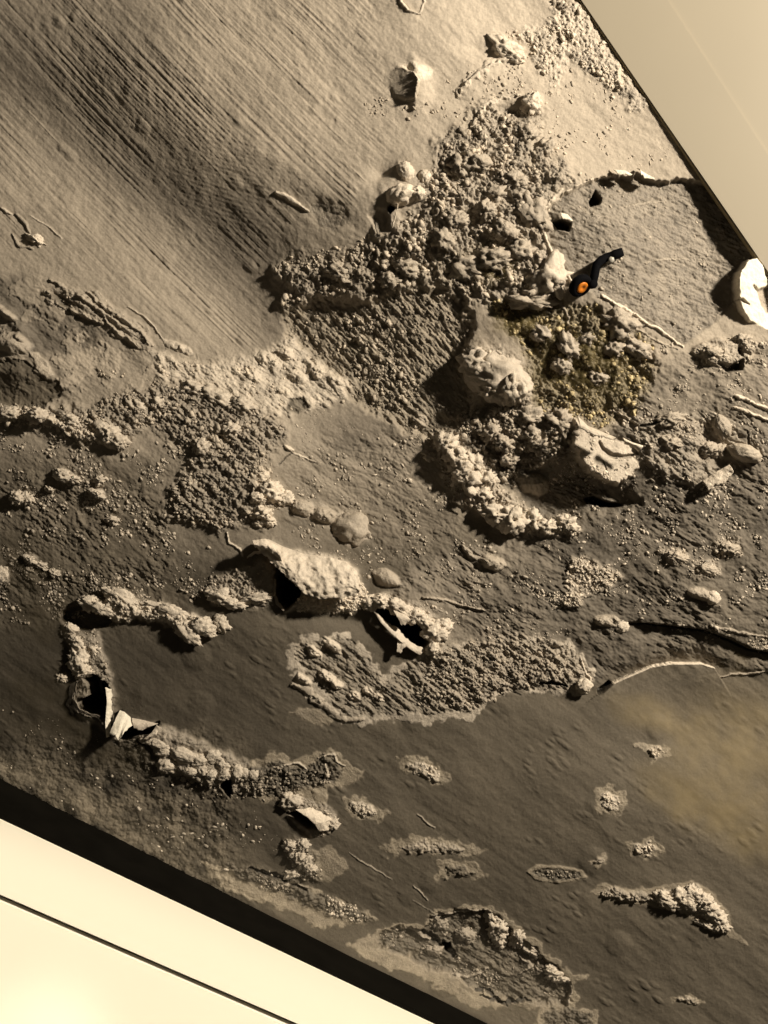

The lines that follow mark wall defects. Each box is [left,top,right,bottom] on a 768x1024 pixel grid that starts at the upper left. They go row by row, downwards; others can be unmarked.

peeling [42,279,165,351]
spalling [272,103,768,538]
spalling [0,379,765,824]
crack [627,621,768,655]
spalling [203,834,599,1024]
spalling [528,853,749,946]